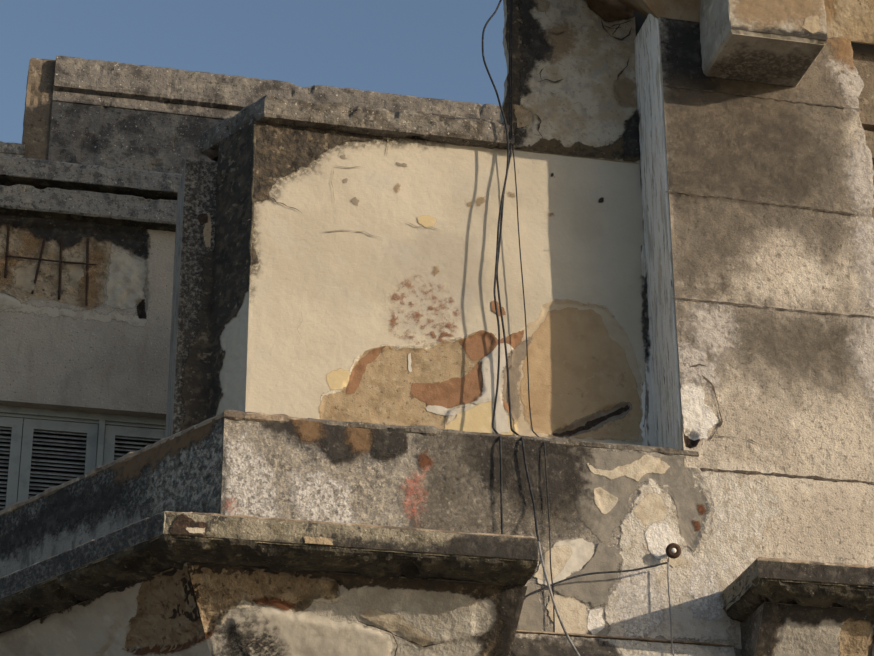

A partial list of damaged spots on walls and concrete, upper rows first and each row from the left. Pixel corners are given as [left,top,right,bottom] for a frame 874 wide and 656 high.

damp [827,59,864,113]
spalling [0,224,112,309]
damp [684,129,874,413]
damp [0,118,426,598]
damp [271,432,594,560]
peeling [147,245,781,646]
crack [690,364,767,447]
crack [699,468,874,484]
flaking render [125,565,341,656]
crack [356,606,440,656]
damp [294,571,621,656]
spalling [838,617,873,656]